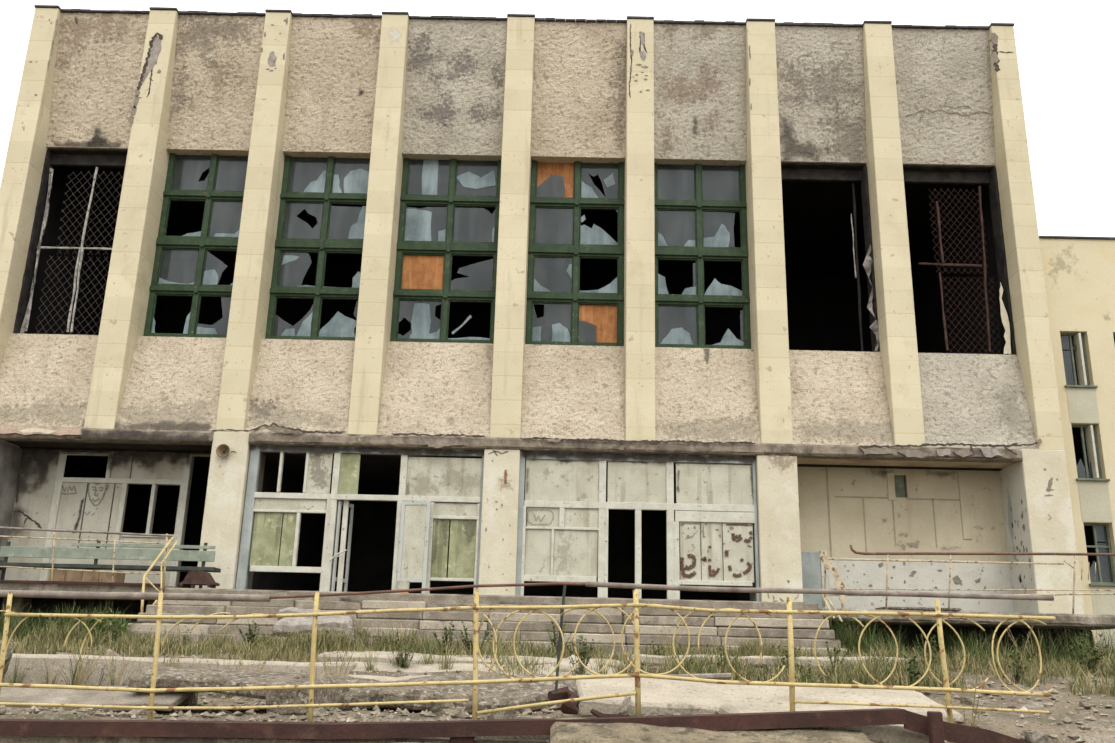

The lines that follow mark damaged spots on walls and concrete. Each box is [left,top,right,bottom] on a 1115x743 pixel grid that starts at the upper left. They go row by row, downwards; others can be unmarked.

spalling [128,32,163,126]
damp [408,33,503,125]
spalling [634,31,650,93]
crack [905,97,987,121]
spalling [859,443,1018,458]
peeling [1007,487,1032,601]